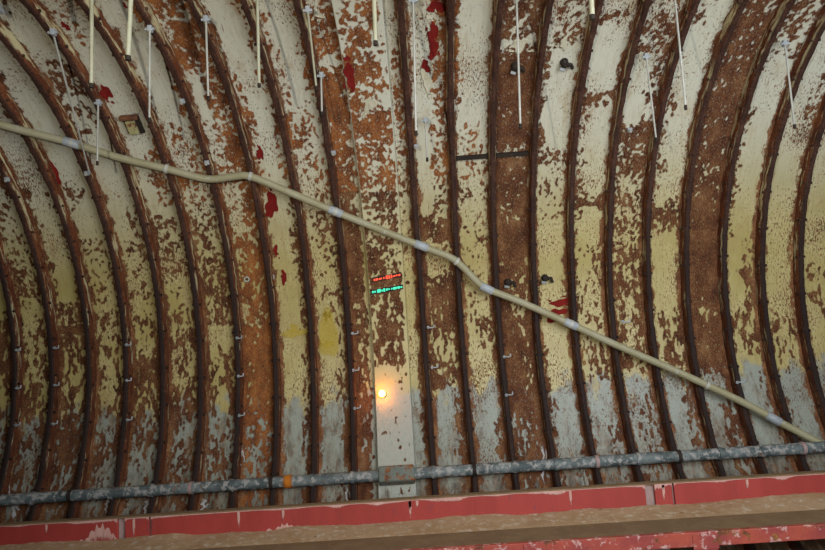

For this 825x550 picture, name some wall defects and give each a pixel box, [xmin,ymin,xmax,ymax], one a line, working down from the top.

corrosion [52,0,89,48]
corrosion [45,59,97,137]
peeling [99,85,115,104]
corrosion [803,73,825,121]
corrosion [141,0,780,484]
corrosion [806,262,825,319]
corrosion [0,176,49,494]
corrosion [21,182,160,491]
corrosion [769,309,805,374]
corrosion [282,475,310,504]
corrosion [336,482,374,501]
corrosion [501,468,593,490]